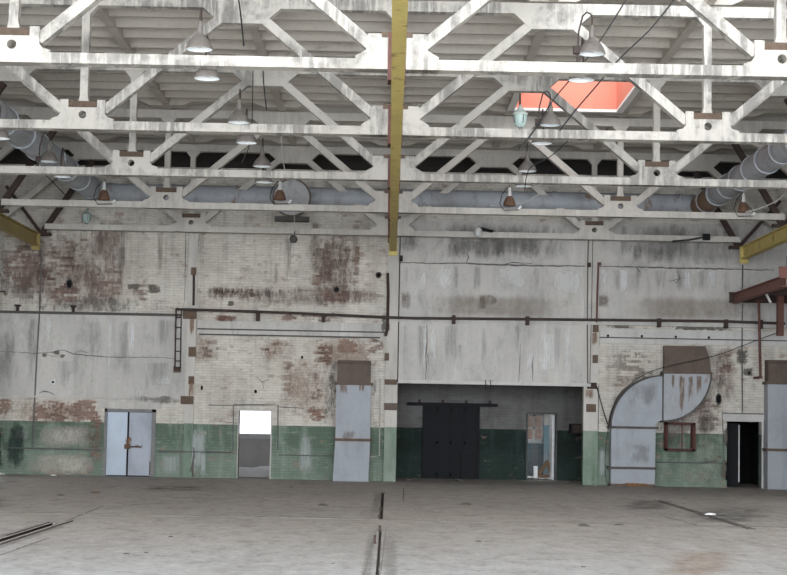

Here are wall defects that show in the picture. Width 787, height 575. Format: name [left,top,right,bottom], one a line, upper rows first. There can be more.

peeling [3,245,79,302]
peeling [314,246,359,305]
peeling [313,339,357,365]
peeling [0,399,13,414]
peeling [308,389,326,422]
corrosion [672,375,701,410]
leakage [0,428,24,465]
peeling [35,401,101,476]